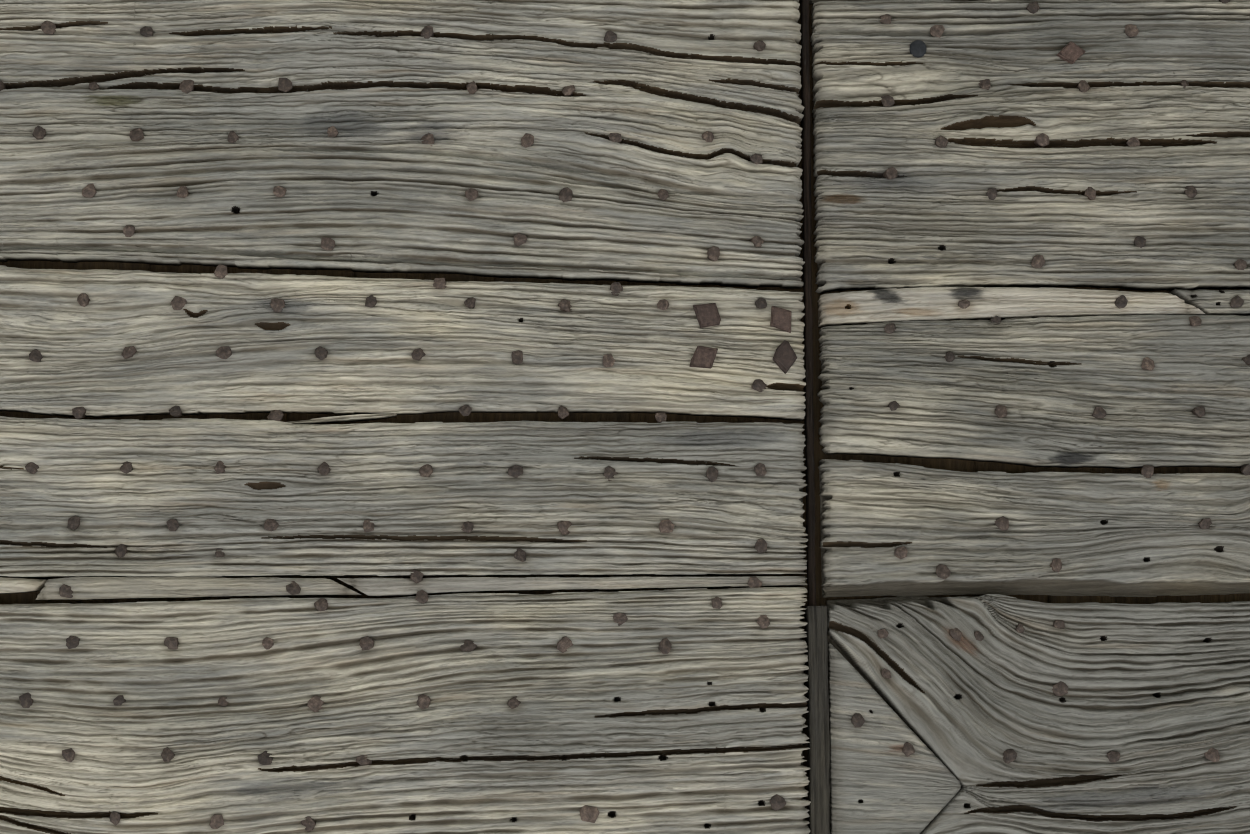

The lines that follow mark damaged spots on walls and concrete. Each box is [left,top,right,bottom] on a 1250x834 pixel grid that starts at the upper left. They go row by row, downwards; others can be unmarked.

crack [4,25,1250,148]
crack [585,132,907,178]
crack [0,776,158,834]